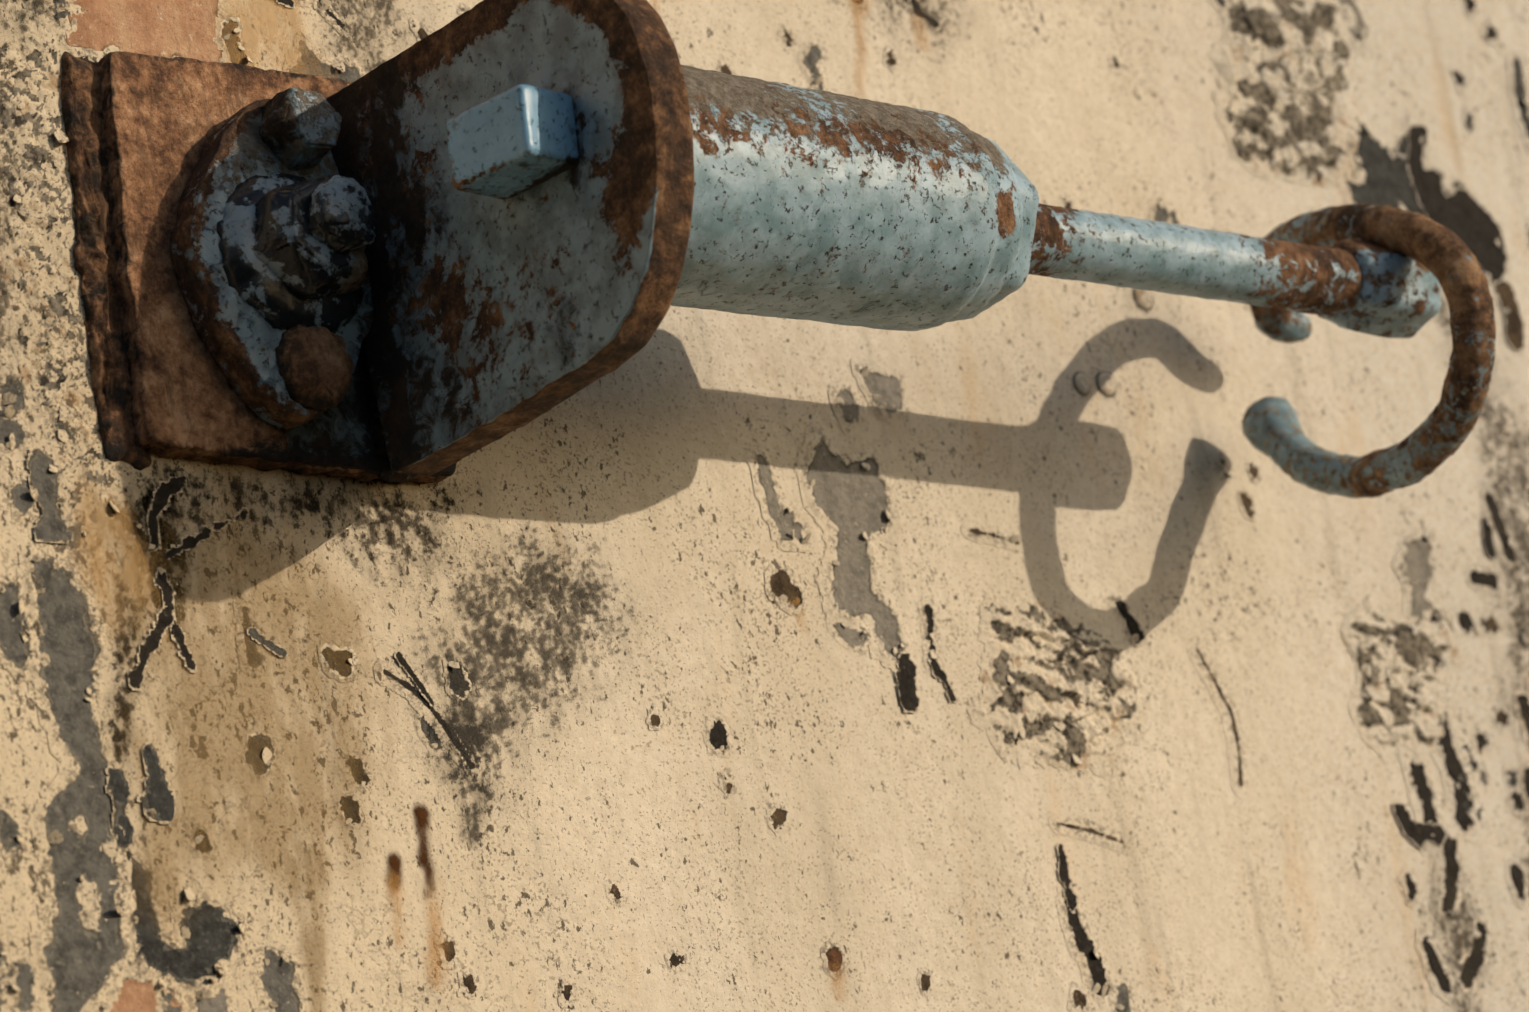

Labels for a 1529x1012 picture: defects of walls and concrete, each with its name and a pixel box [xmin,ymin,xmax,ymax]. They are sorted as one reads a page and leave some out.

peeling [279,33,368,82]
peeling [1209,0,1229,13]
peeling [1335,0,1372,51]
peeling [1340,109,1529,351]
peeling [0,0,308,1012]
peeling [744,357,920,713]
peeling [317,638,361,683]
peeling [1392,484,1529,1006]
peeling [332,750,377,830]
rust [389,854,401,890]
rust [415,805,434,890]